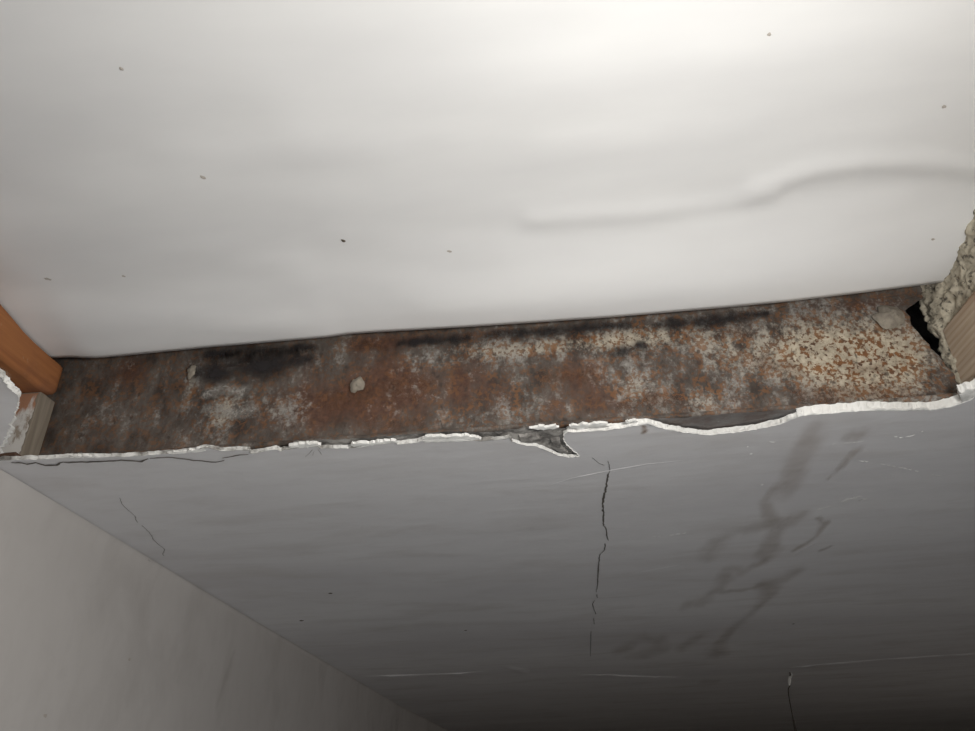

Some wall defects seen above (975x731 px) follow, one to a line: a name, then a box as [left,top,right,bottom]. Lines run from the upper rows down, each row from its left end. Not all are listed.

spalling [0,369,975,461]
crack [590,459,610,656]